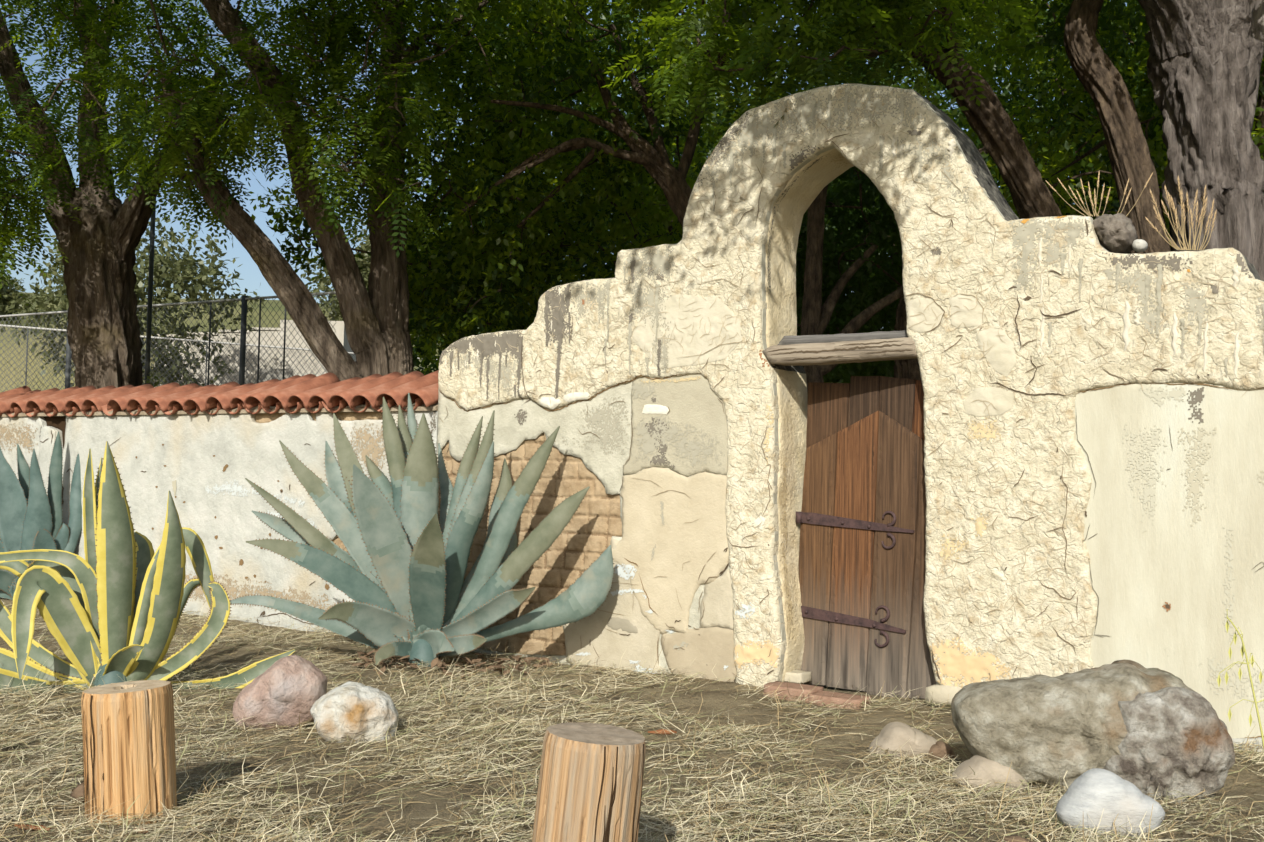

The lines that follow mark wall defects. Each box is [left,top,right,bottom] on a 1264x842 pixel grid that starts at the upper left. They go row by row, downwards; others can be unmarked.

spalling [438,443,461,516]
water stain [439,330,527,425]
spalling [464,433,622,656]
water stain [544,246,725,470]
crack [906,286,1264,682]